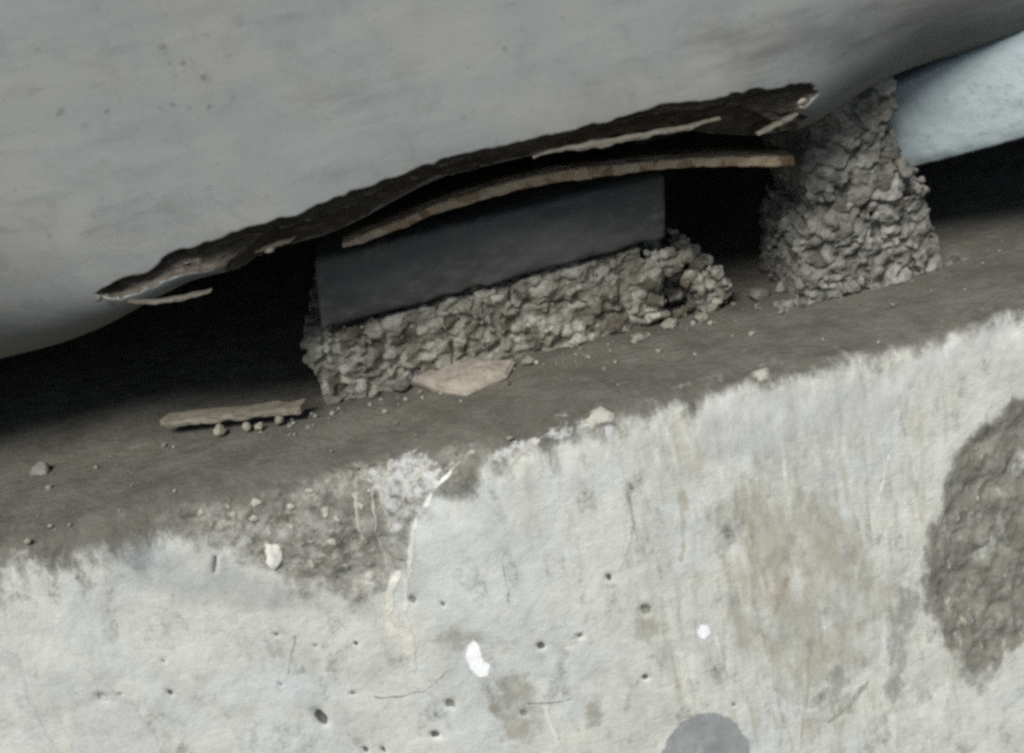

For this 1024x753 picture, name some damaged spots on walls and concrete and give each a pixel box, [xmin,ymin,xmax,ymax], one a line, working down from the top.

spalling [95,83,817,305]
spalling [188,445,476,601]